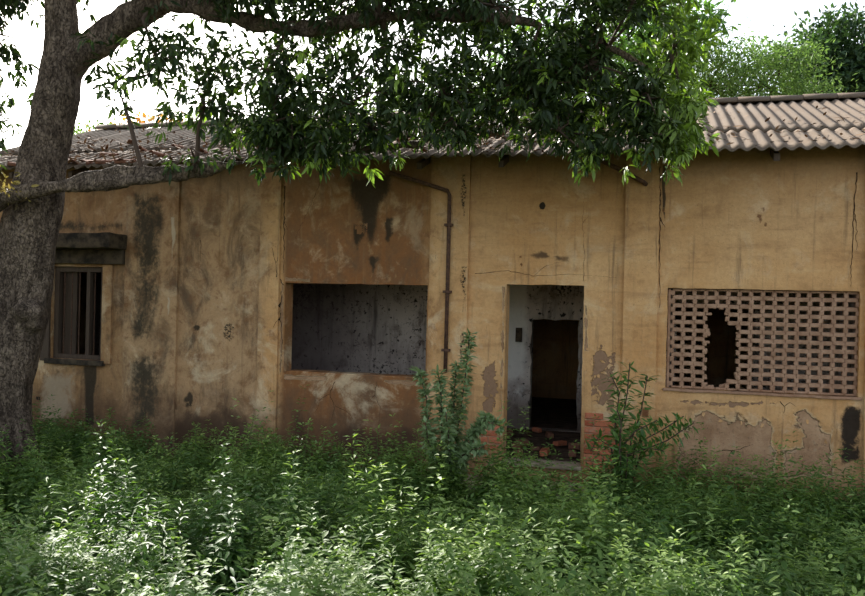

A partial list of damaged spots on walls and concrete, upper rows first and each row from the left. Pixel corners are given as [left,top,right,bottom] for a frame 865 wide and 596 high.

water stain [338,165,401,281]
crack [657,167,665,308]
crack [850,172,858,281]
water stain [59,184,259,460]
peeling [476,286,506,450]
peeling [583,304,623,475]
spalling [670,395,838,485]